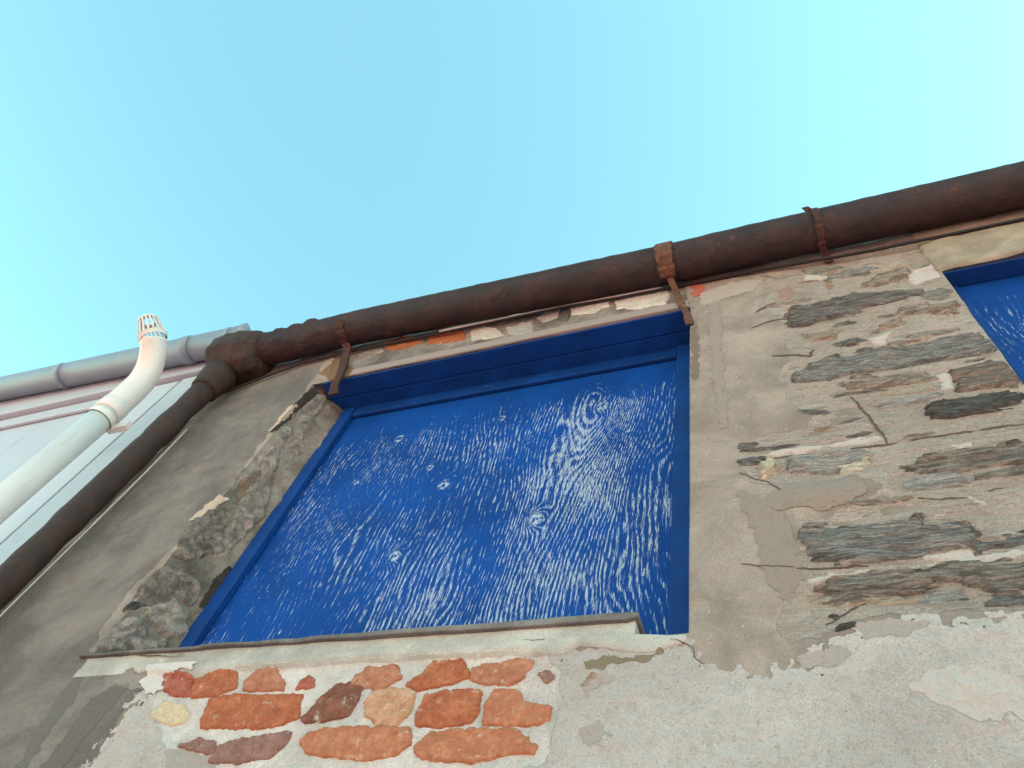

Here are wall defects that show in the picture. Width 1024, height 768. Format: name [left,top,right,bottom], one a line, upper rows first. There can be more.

corrosion [690,278,706,297]
spalling [736,241,1024,669]
crack [777,396,1024,458]